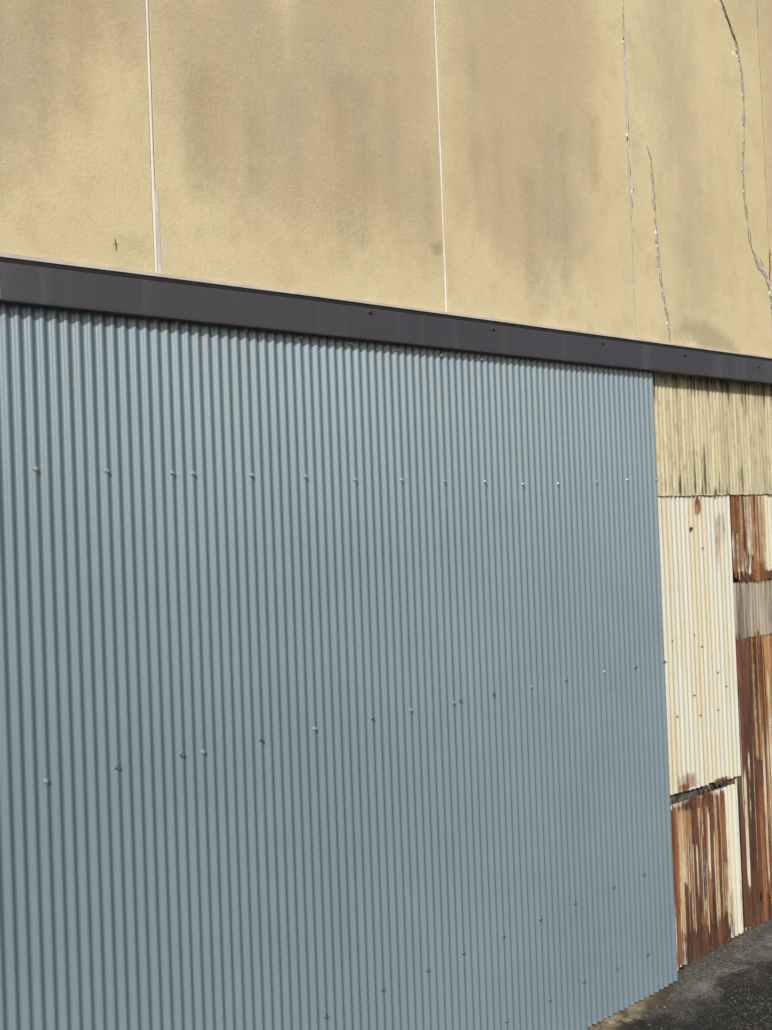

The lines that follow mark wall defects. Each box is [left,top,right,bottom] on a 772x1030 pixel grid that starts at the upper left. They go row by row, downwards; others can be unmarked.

crack [622,4,671,342]
crack [715,0,772,307]
leakage [694,448,728,496]
leakage [653,374,772,407]
rust [716,494,772,582]
rust [671,632,772,968]